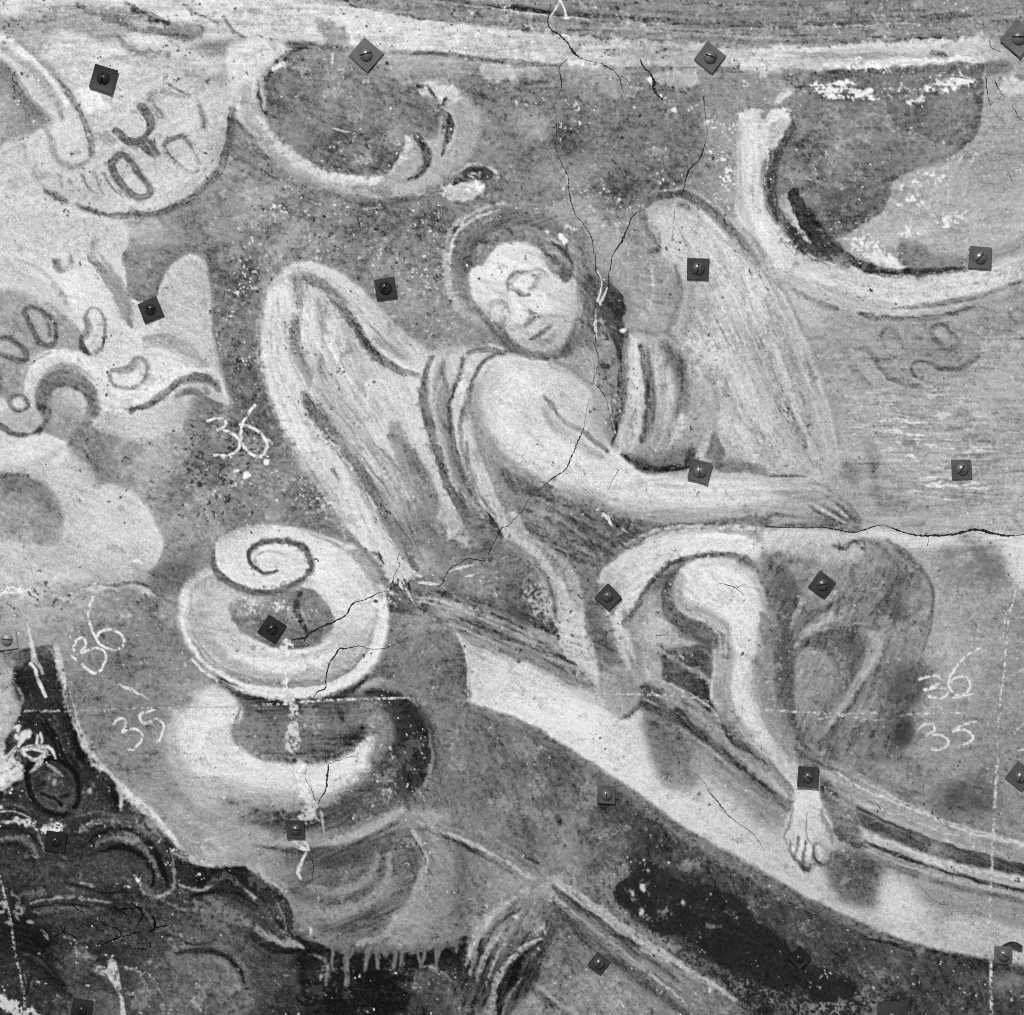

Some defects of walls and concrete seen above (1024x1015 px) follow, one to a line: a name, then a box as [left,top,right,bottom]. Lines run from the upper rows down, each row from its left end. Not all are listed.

crack [437,0,707,587]
crack [765,525,1024,546]
crack [291,553,415,697]
crack [293,745,351,804]